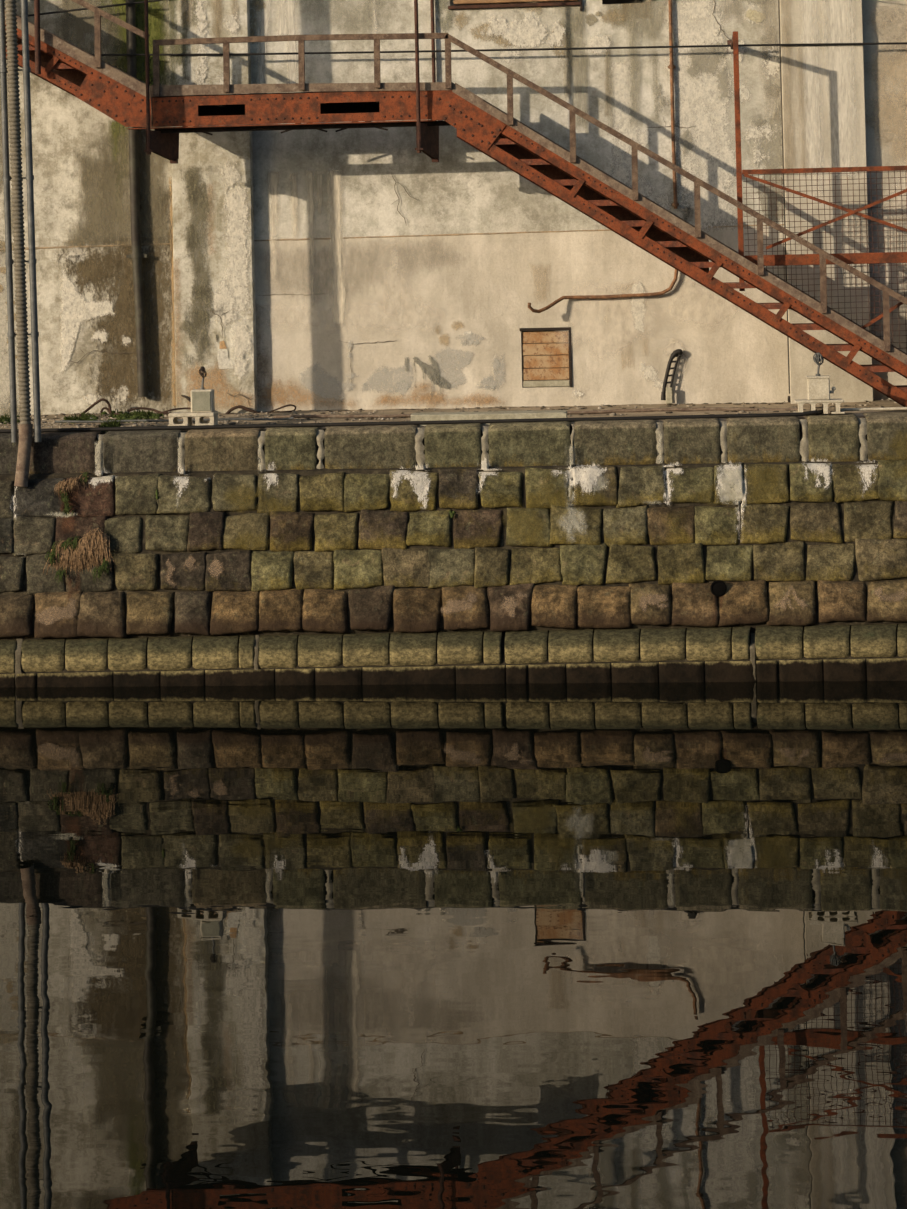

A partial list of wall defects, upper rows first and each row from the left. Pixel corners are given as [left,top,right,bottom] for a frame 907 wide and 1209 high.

damp [61,0,126,71]
damp [57,121,215,411]
spalling [300,331,505,400]
efflorescence [391,464,431,510]
damp [476,457,499,492]
damp [506,446,607,543]
efflorescence [650,435,685,504]
efflorescence [716,463,747,539]
efflorescence [803,459,833,489]
damp [857,456,890,490]